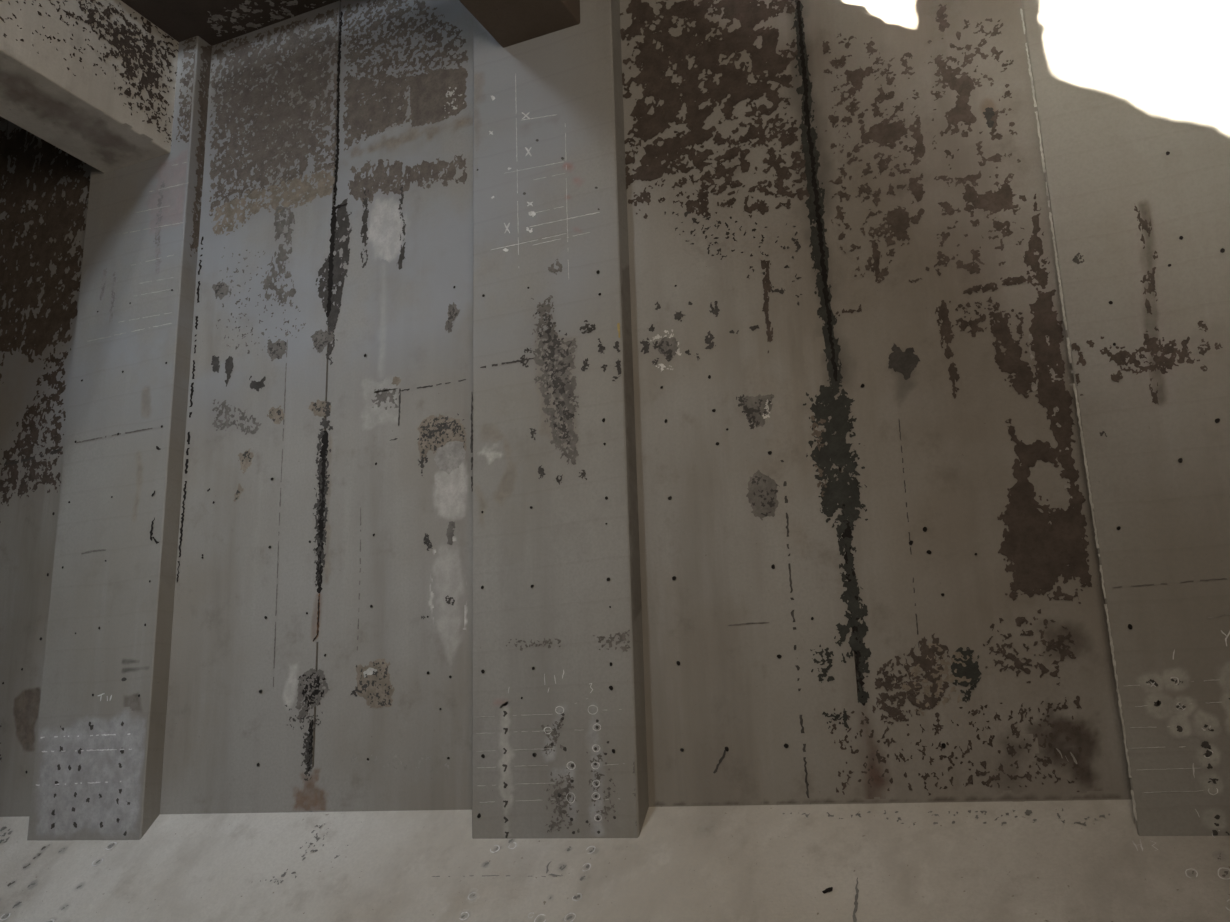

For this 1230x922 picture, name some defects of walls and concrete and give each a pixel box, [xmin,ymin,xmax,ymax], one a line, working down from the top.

crack [326,11,348,317]
leakage [209,109,473,441]
leakage [778,0,868,528]
leakage [1134,197,1172,409]
leakage [473,419,521,532]
leakage [0,685,42,754]
leakage [421,521,468,677]
leakage [810,642,838,683]
leakage [1026,612,1103,671]